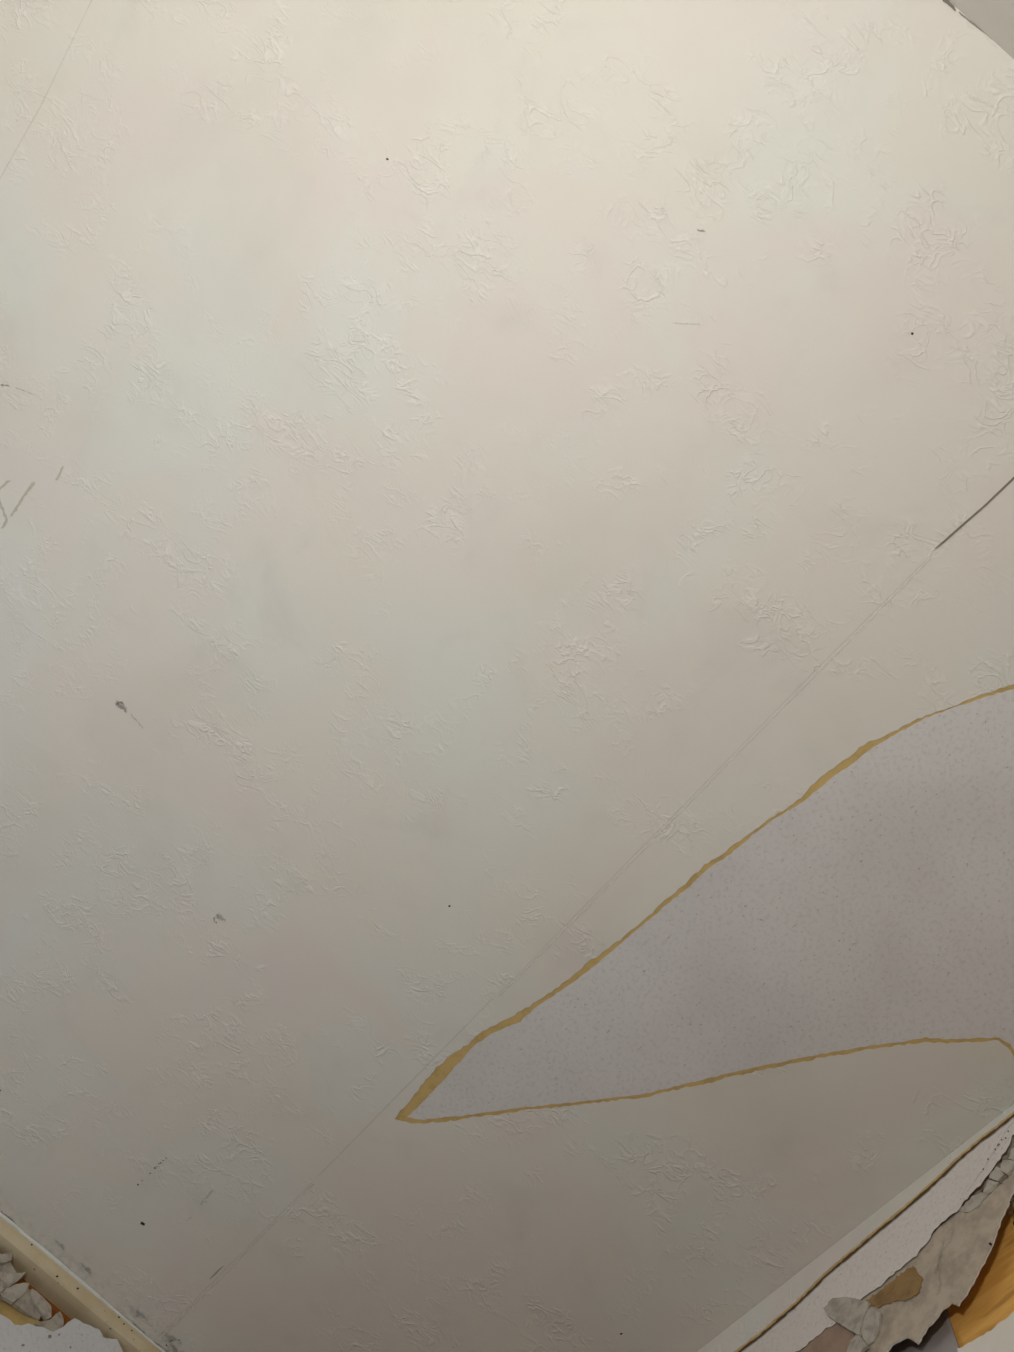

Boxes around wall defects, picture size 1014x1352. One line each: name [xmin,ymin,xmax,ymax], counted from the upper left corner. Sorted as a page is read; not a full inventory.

crack [943,0,988,36]
peeling [395,684,1014,1124]
spalling [959,1147,1014,1213]
peeling [823,1297,882,1352]